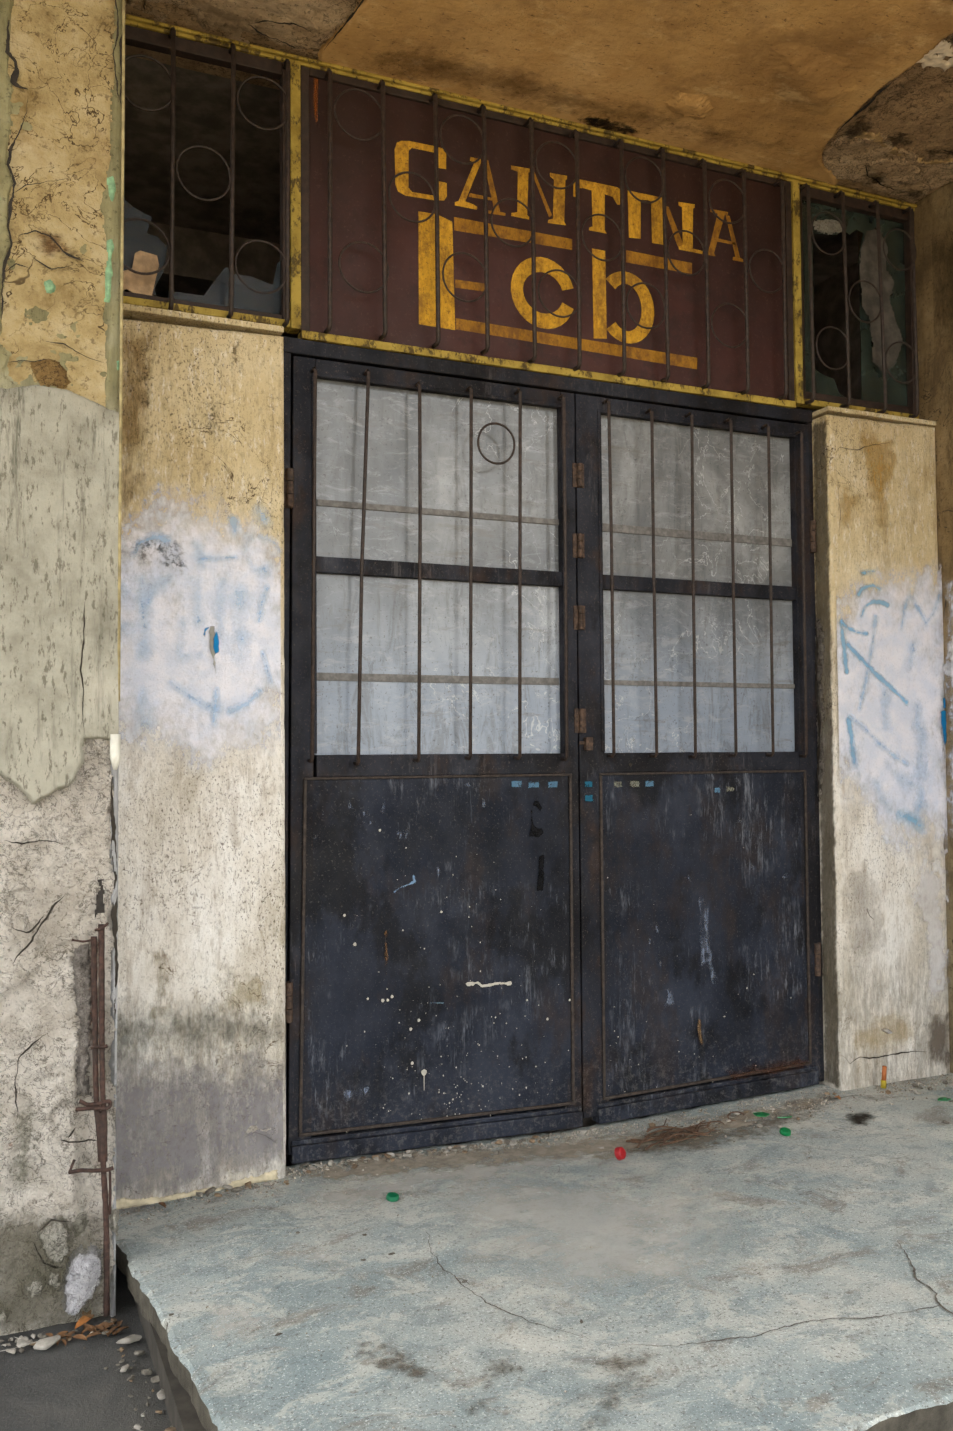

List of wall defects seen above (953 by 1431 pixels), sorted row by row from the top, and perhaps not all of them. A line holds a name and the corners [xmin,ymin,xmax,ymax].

crack [250,0,364,50]
spalling [822,33,953,204]
peeling [0,0,359,408]
crack [6,838,63,846]
crack [13,896,64,963]
crack [14,1033,48,1117]
spalling [0,739,279,1347]
damp [116,1066,283,1193]
damp [172,1015,266,1041]
crack [427,1233,953,1346]